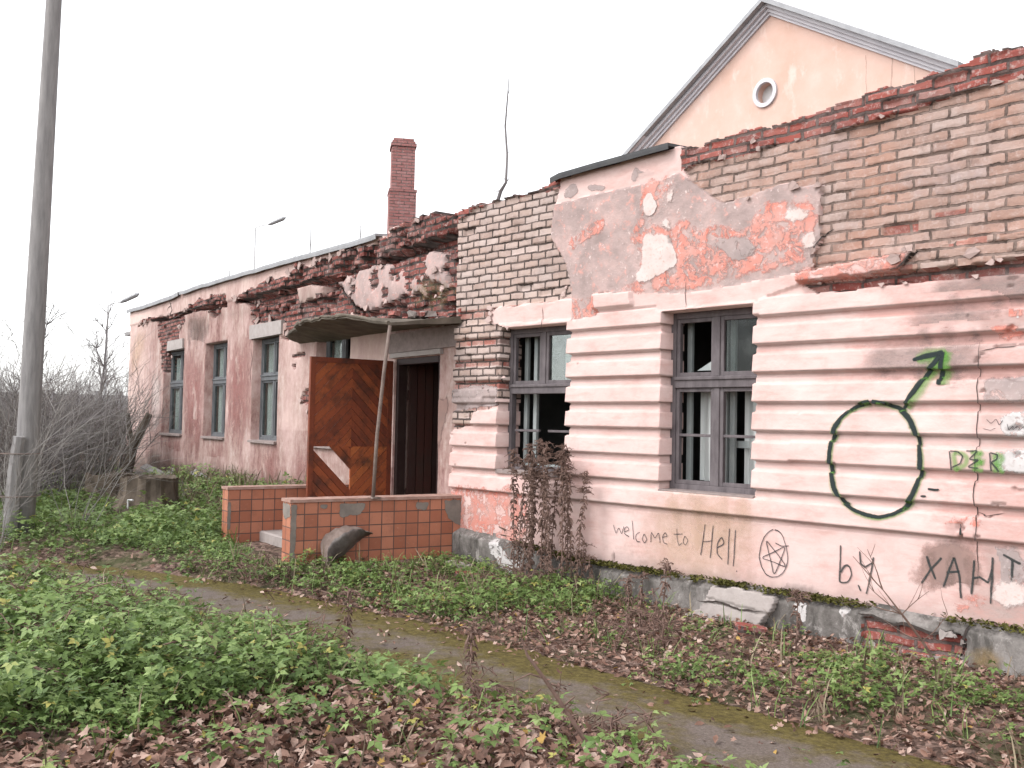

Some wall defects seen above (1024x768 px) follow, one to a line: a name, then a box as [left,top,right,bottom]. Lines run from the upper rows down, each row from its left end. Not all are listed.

spalling [231,78,1024,446]
spalling [139,307,187,374]
crack [973,343,1019,571]
peeling [445,485,527,572]
water stain [916,540,980,587]
spalling [861,616,967,662]